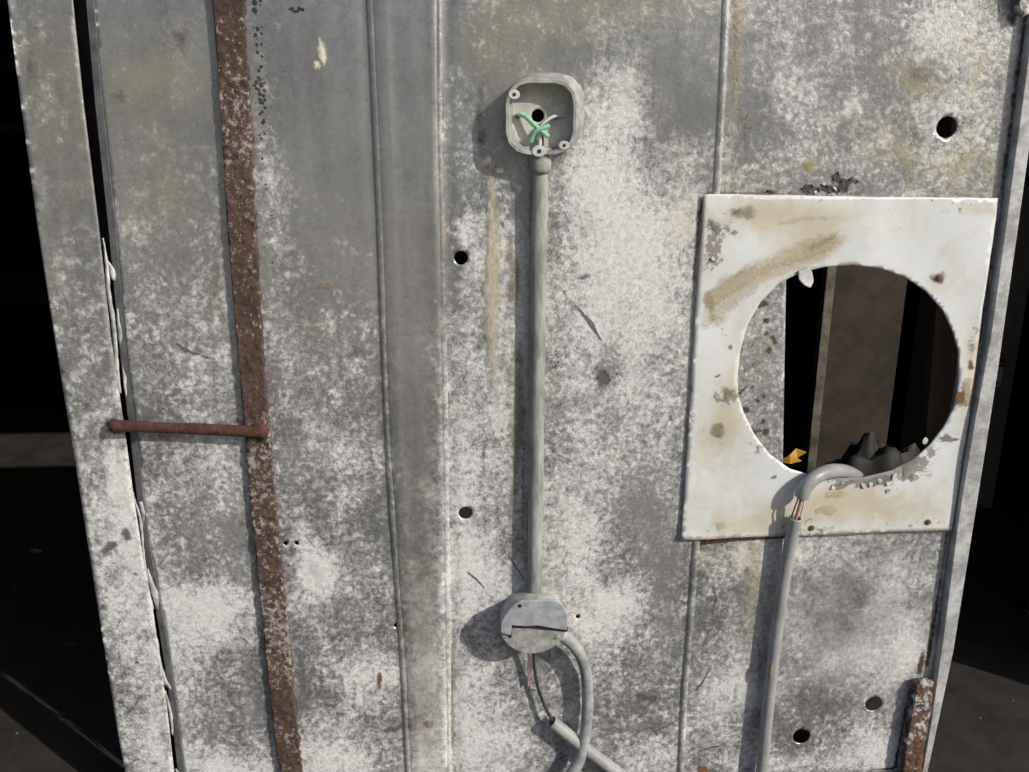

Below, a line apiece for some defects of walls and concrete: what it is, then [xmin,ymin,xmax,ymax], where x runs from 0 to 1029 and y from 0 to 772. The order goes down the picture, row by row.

peeling [790,172,858,194]
rust [212,0,303,772]
peeling [923,434,959,444]
peeling [831,456,919,493]